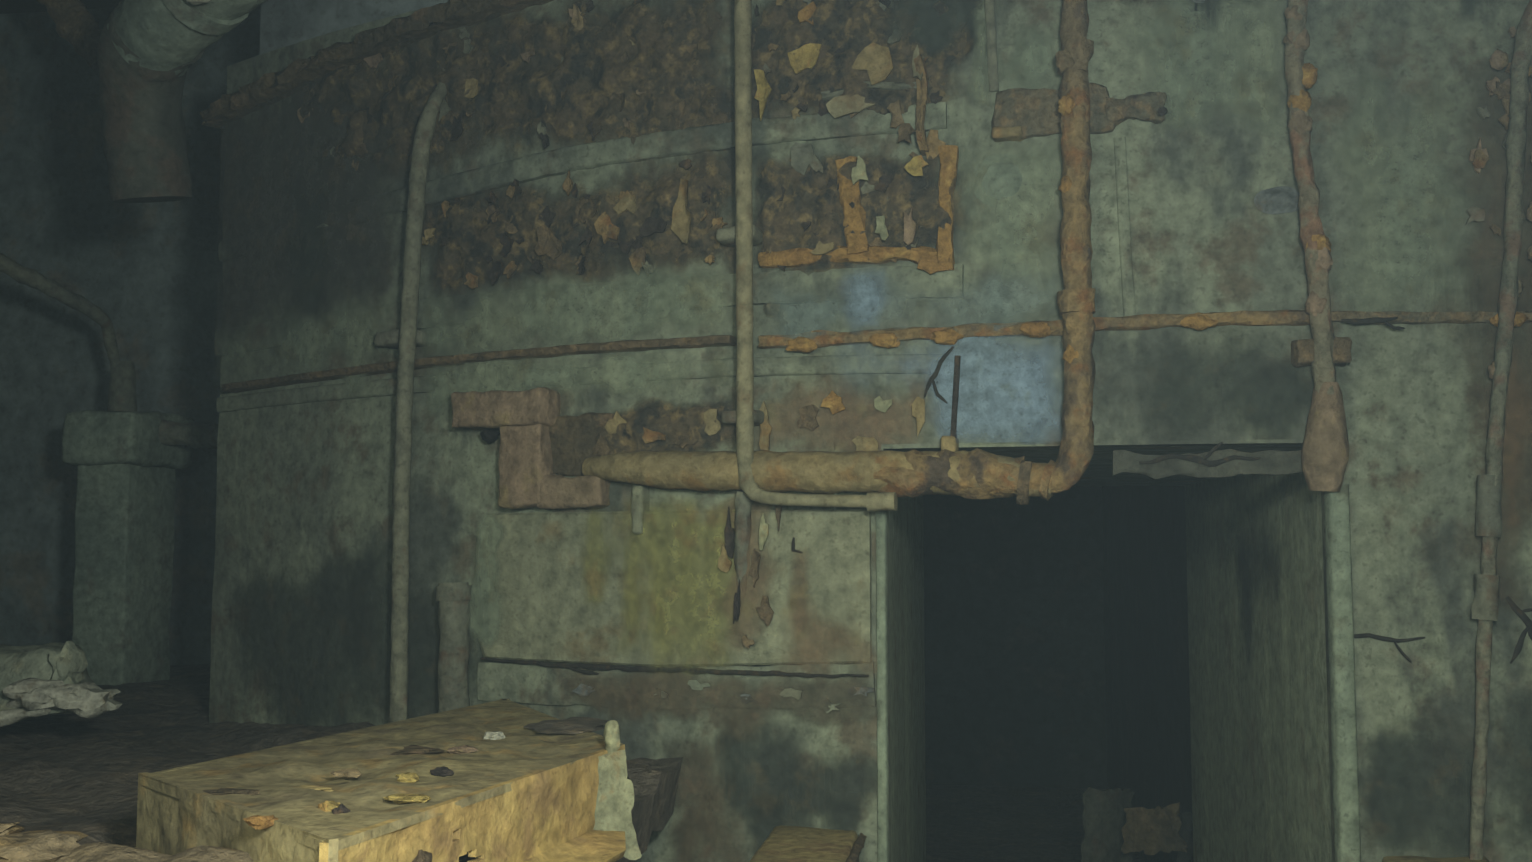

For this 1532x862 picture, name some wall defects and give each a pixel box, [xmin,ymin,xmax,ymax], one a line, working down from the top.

corrosion [751,0,971,121]
corrosion [422,149,736,292]
corrosion [755,130,957,273]
corrosion [797,391,846,431]
crack [924,346,954,403]
water stain [243,558,440,725]
peeling [718,505,782,649]
water stain [1231,491,1332,862]
crack [1354,633,1425,663]
crack [1505,596,1532,664]
water stain [1363,728,1473,854]